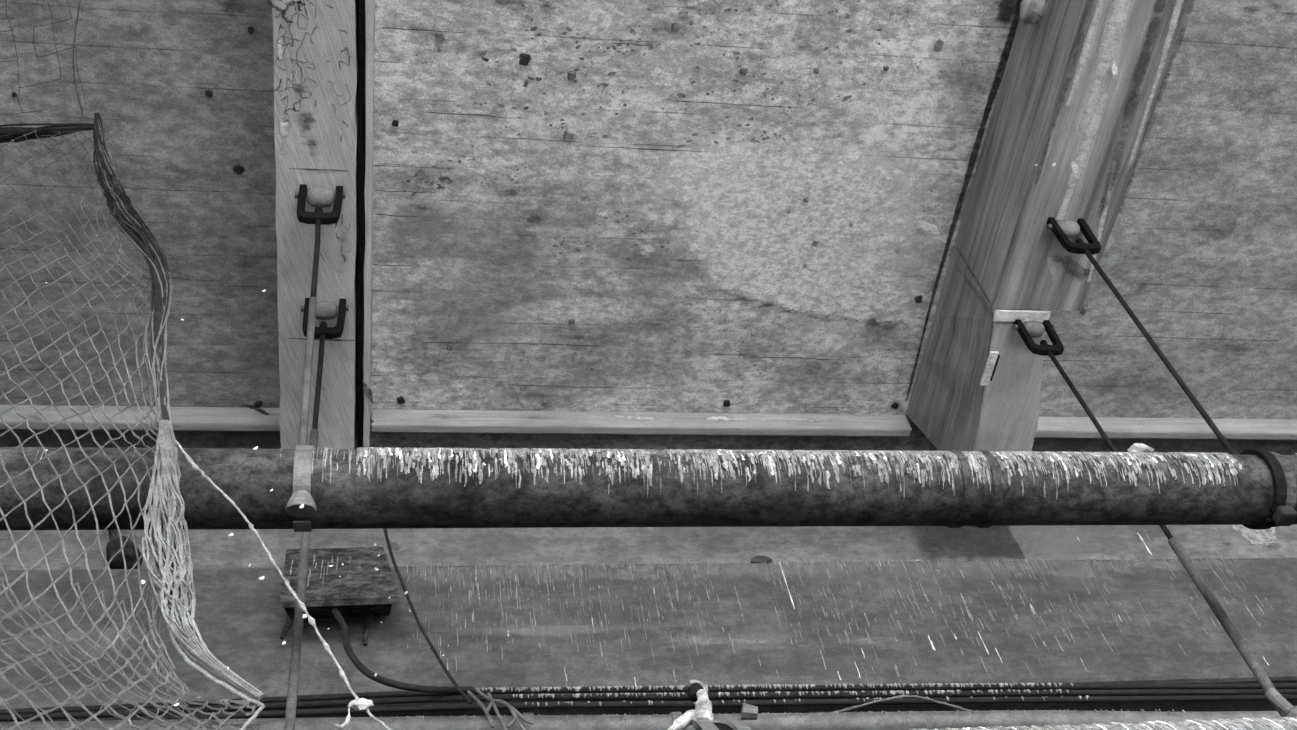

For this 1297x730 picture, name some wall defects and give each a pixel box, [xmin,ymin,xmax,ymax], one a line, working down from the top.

water stain [311,447,1242,499]
water stain [407,562,779,678]
water stain [761,526,1150,683]
water stain [1138,532,1281,633]
water stain [897,716,1297,730]